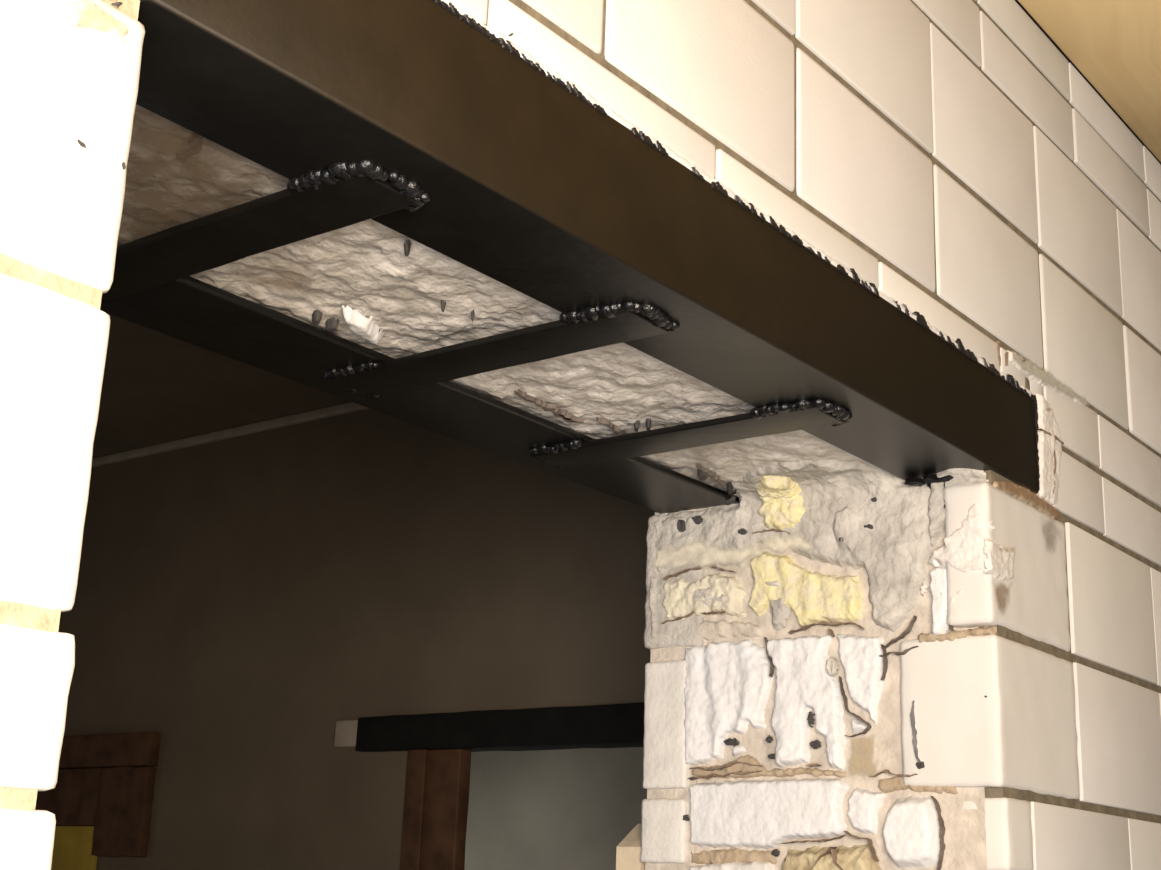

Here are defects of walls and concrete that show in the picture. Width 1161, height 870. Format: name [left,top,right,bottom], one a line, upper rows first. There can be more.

spalling [677,516,703,532]
spalling [756,475,806,530]
crack [764,616,919,681]
spalling [662,551,940,870]
crack [838,676,872,737]